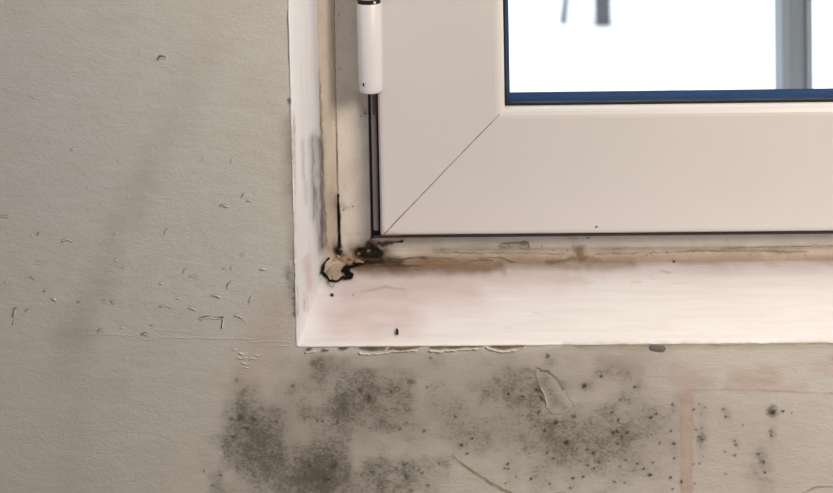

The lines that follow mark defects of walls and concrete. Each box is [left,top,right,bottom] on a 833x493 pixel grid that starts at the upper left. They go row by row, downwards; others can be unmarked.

damp [312,115,512,270]
peeling [535,367,572,414]
damp [225,405,280,471]
damp [295,450,346,493]
crack [455,458,511,493]